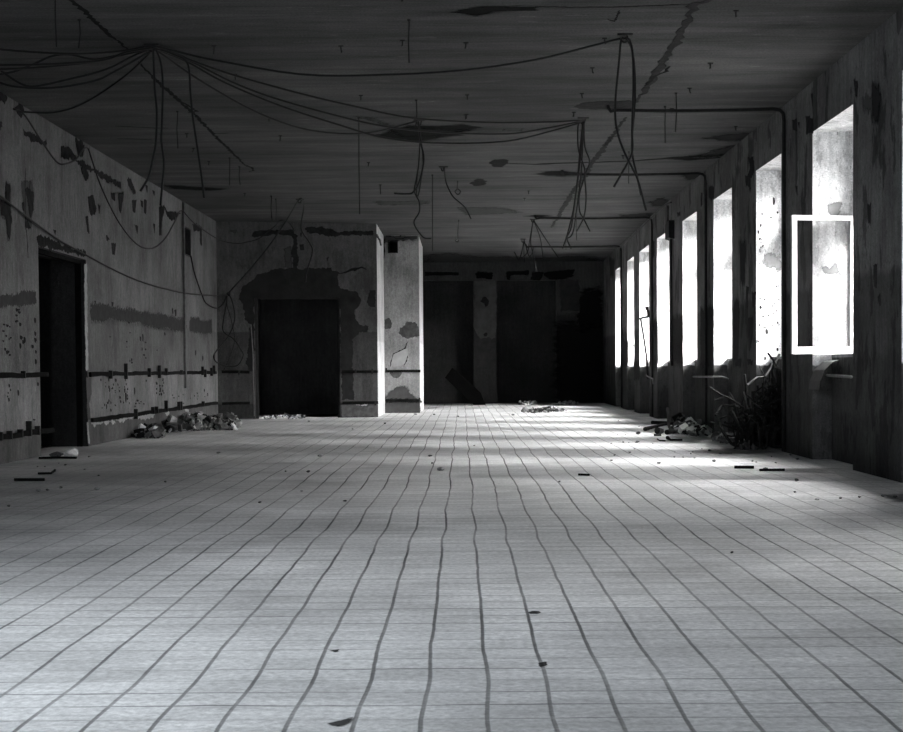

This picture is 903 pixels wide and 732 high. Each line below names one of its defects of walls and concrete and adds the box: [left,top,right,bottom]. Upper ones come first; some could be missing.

crack [69,0,255,172]
crack [535,0,712,228]
peeling [0,181,12,239]
peeling [111,177,155,214]
peeling [22,187,212,371]
peeling [0,289,37,364]
flaking render [239,267,376,400]
flaking render [384,318,419,339]
peeling [87,379,169,444]